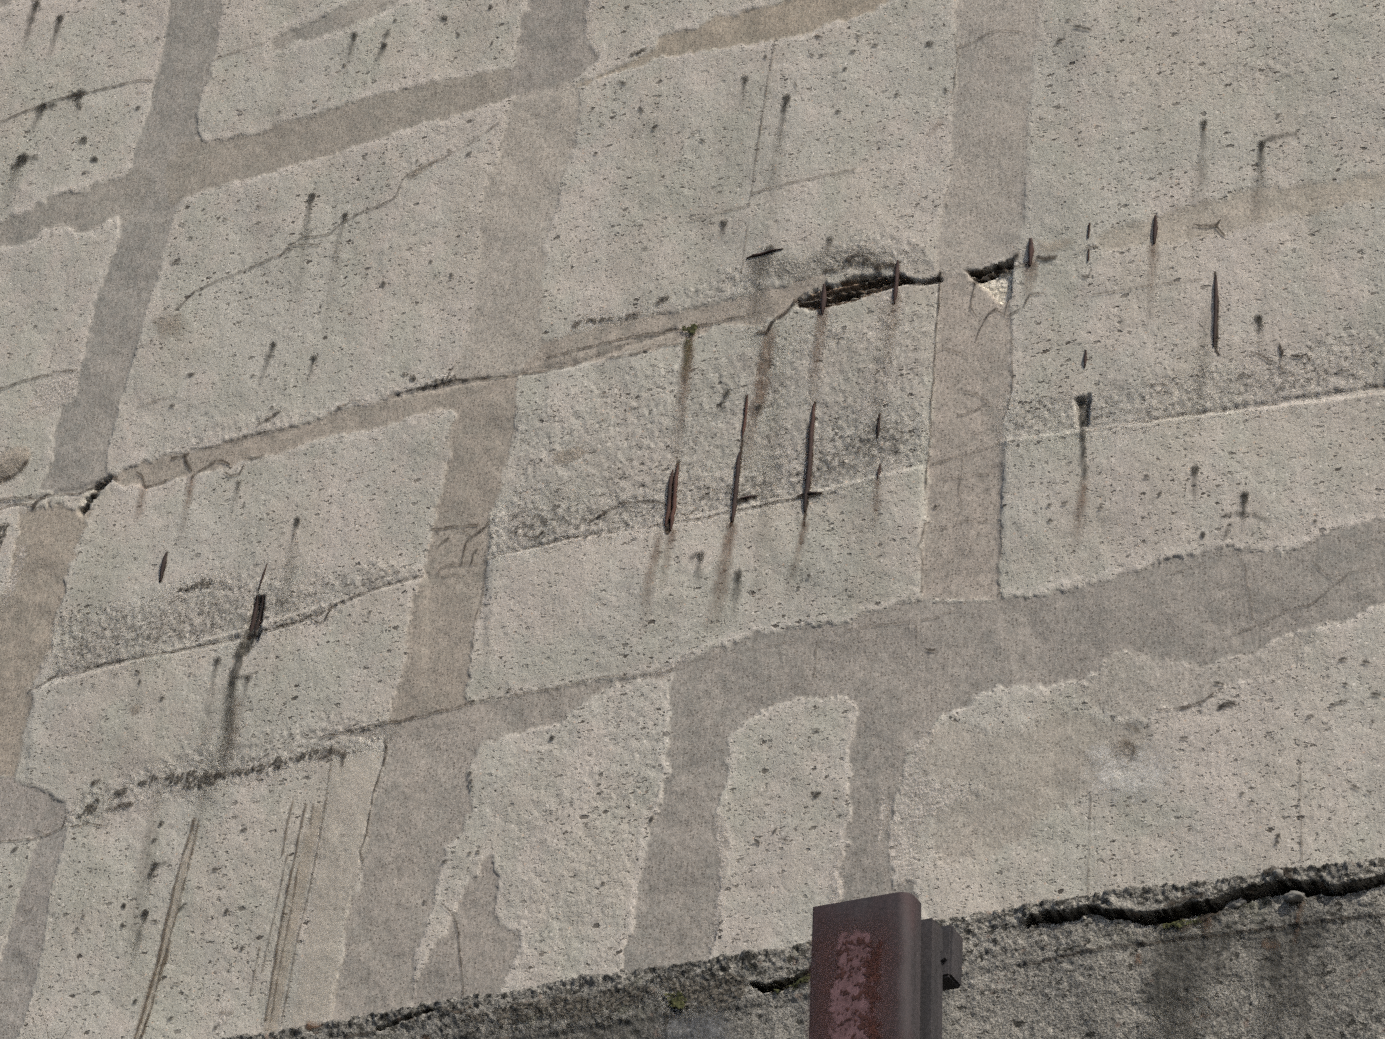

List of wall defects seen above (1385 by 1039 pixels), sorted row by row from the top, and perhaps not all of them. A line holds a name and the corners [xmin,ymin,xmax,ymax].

spalling [746,248,906,315]
spalling [965,238,1034,305]
crack [0,369,77,389]
crack [337,301,799,407]
crack [0,430,271,514]
water stain [215,597,263,696]
crack [1027,866,1384,932]
crack [750,977,799,993]